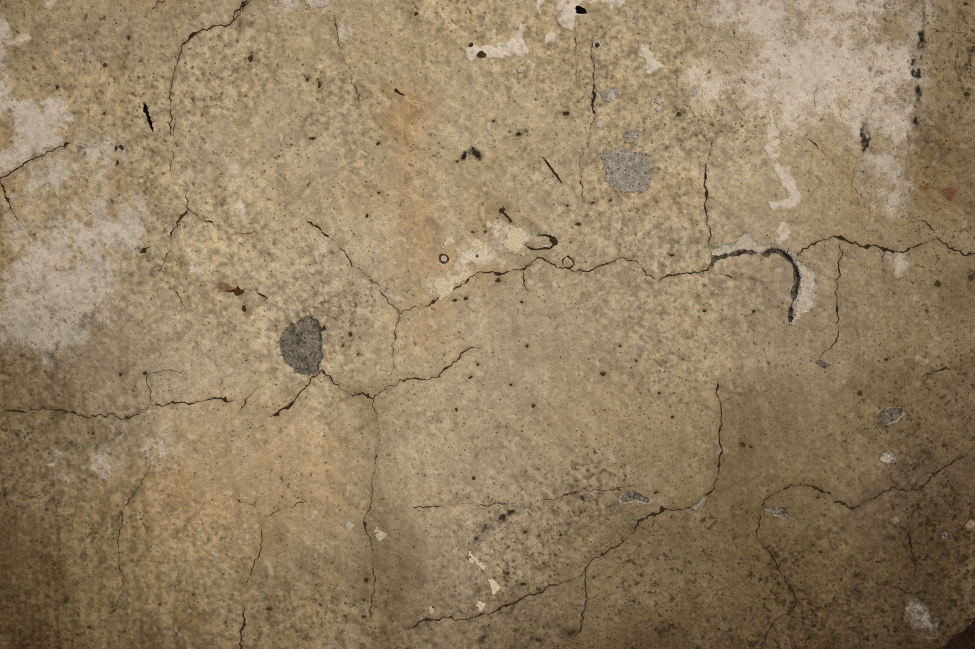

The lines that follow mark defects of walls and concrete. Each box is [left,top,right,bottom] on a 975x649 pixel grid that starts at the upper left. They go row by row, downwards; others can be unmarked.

peeling [268,0,330,27]
crack [157,0,255,304]
spalling [597,130,655,201]
crack [4,370,255,420]
spalling [280,317,326,376]
crack [270,143,737,649]
spalling [709,221,818,325]
leakage [604,0,975,649]
crack [798,220,974,358]
leakage [0,506,114,649]
crack [756,455,967,649]
spalling [942,619,975,649]